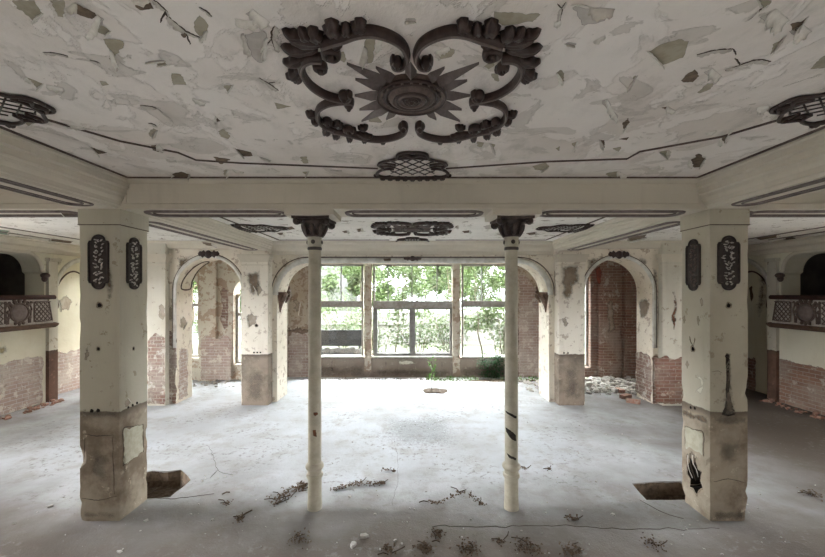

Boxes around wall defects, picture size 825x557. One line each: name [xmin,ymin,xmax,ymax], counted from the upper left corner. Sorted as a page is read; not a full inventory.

peeling [12,0,43,25]
peeling [50,0,124,72]
peeling [647,39,689,70]
peeling [757,0,812,54]
peeling [681,69,722,93]
peeling [687,154,706,169]
flaking render [200,288,232,380]
flaking render [147,331,188,404]
flaking render [635,352,689,404]
flaking render [779,359,825,416]
crack [147,448,231,499]
spalling [633,452,703,500]